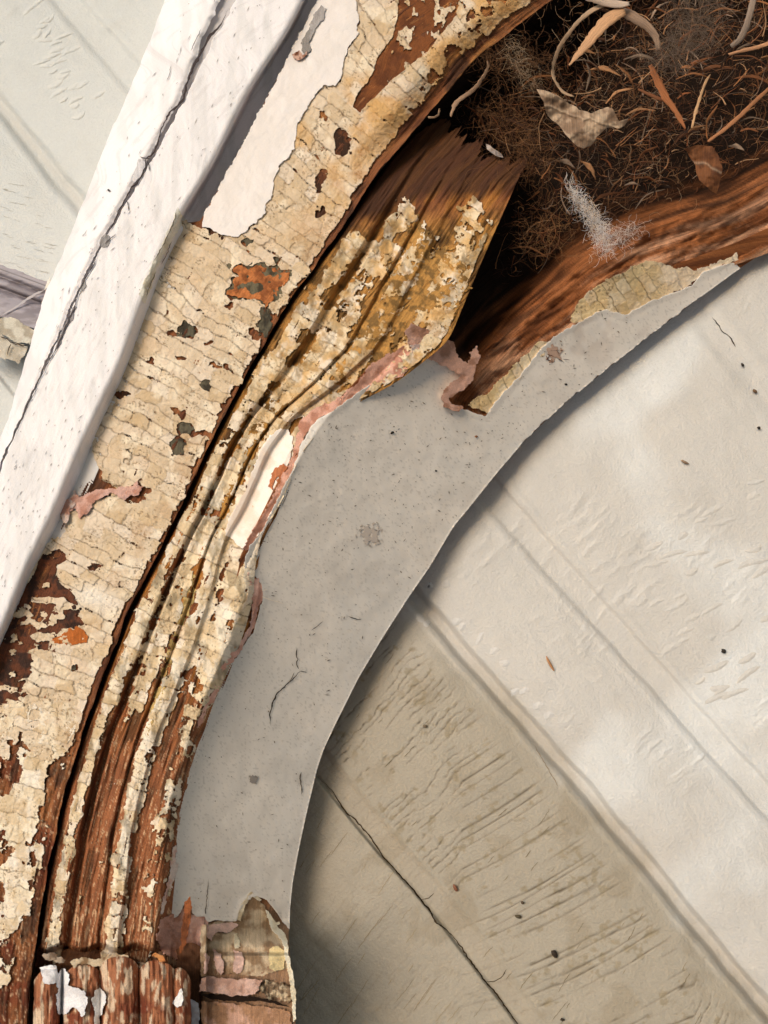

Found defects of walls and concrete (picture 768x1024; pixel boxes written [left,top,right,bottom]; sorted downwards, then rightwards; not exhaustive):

crack [0,0,271,595]
peeling [468,341,547,413]
peeling [570,252,738,323]
peeling [0,0,530,1024]
crack [269,650,307,724]
crack [201,774,532,1024]